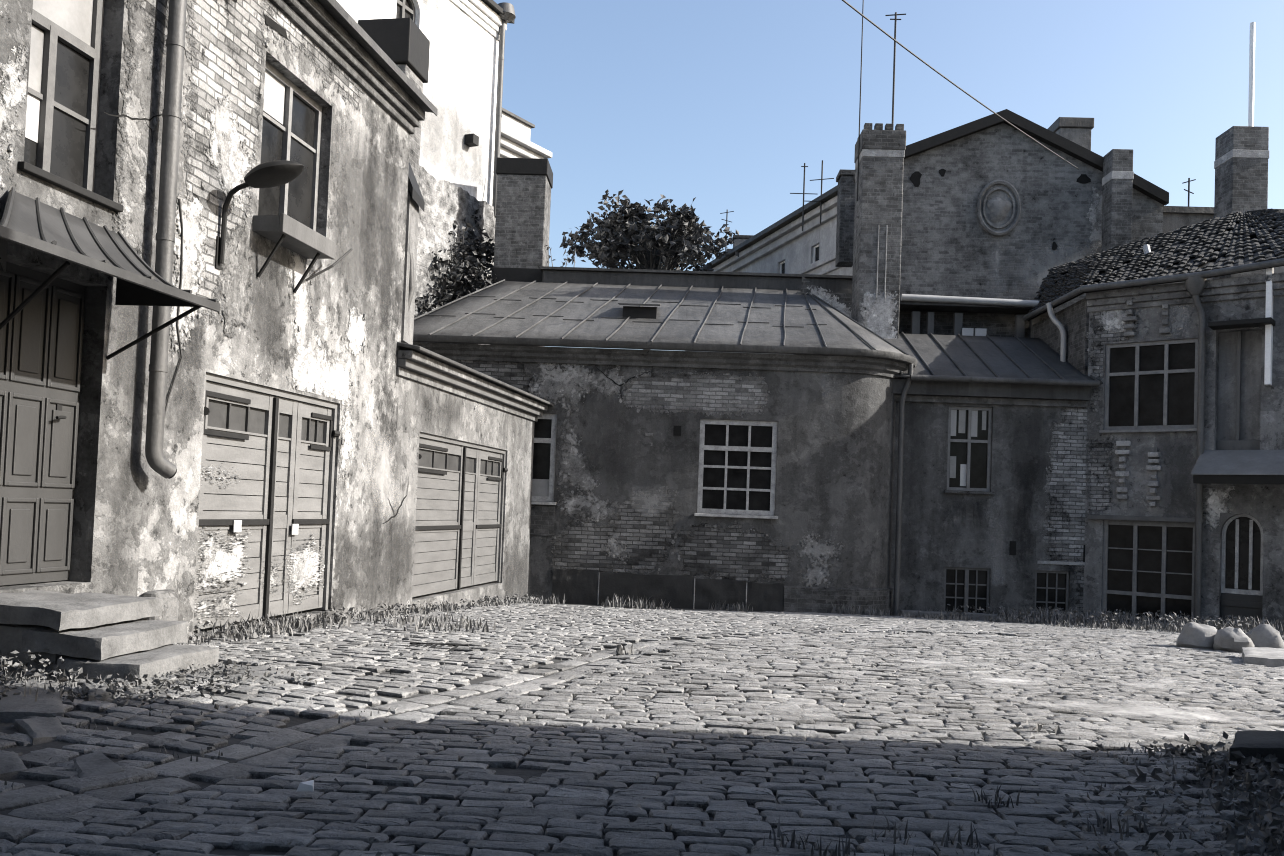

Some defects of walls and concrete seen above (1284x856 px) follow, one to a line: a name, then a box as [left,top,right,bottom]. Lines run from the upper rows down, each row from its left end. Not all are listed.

peeling [0,42,29,204]
peeling [112,0,169,260]
spalling [168,0,364,357]
peeling [194,526,325,631]
spalling [527,363,846,588]